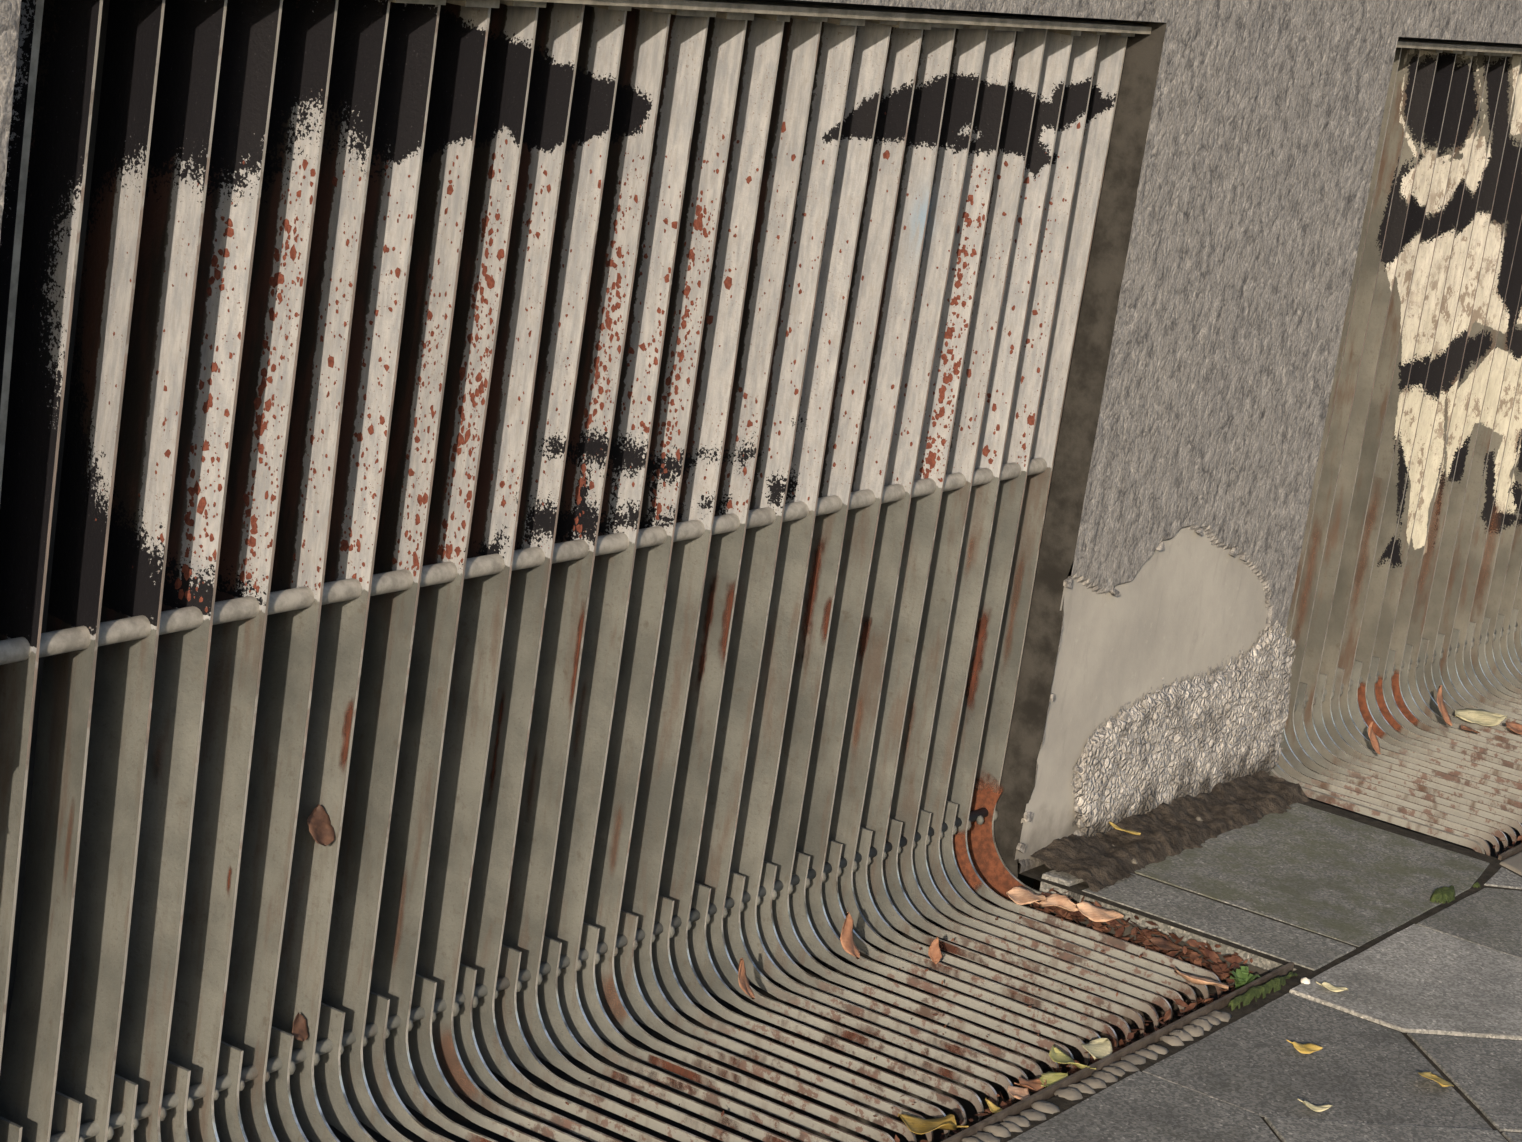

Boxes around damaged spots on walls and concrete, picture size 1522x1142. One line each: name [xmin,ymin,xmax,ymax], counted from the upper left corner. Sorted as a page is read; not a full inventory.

corrosion [175,202,249,612]
corrosion [238,158,363,593]
corrosion [339,160,414,583]
corrosion [392,139,583,576]
corrosion [573,144,737,538]
corrosion [724,349,805,512]
corrosion [804,151,1069,484]
corrosion [802,542,832,658]
corrosion [859,618,872,659]
corrosion [953,776,1025,921]
spalling [1015,528,1272,863]
corrosion [1357,671,1419,738]